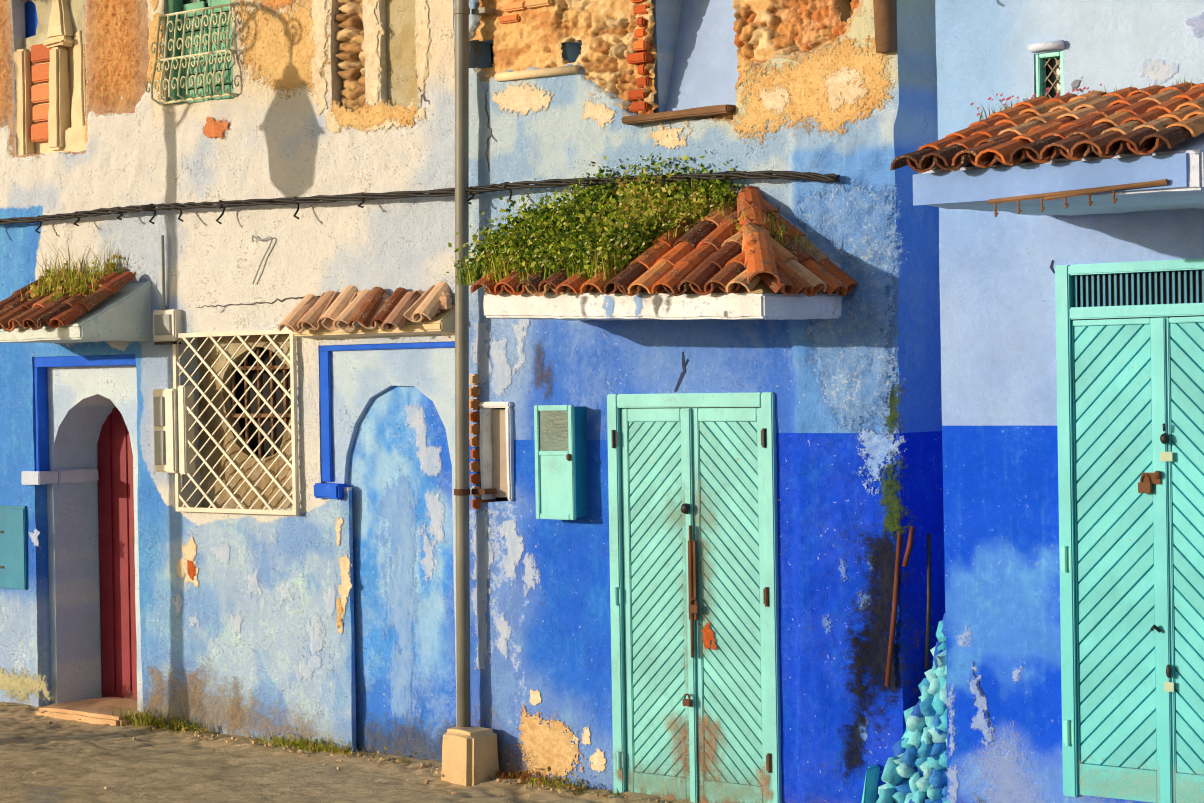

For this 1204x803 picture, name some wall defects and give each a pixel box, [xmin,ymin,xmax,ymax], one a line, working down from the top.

flaking render [0,0,45,157]
flaking render [66,0,164,154]
flaking render [469,0,894,150]
peeling [171,536,230,627]
leakage [137,669,312,740]
peeling [294,517,352,682]
peeling [471,506,540,673]
peeling [515,689,606,783]
corrosion [668,717,719,779]
corrosion [698,622,718,650]
leakage [836,508,924,783]